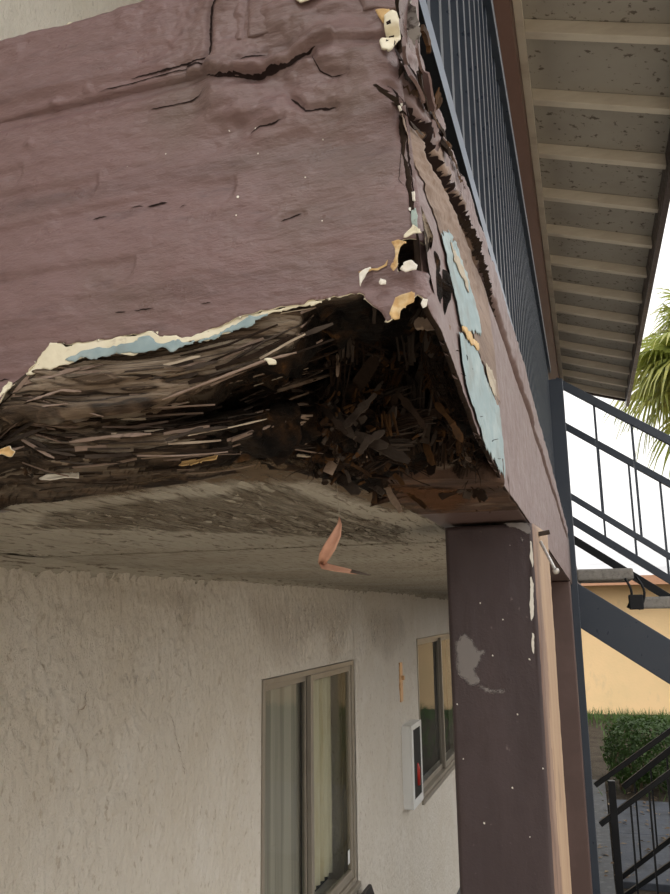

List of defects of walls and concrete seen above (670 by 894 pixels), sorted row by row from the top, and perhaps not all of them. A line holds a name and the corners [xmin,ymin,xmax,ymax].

peeling [375,0,421,52]
crack [105,0,345,109]
crack [291,99,335,112]
peeling [359,105,505,479]
peeling [26,300,323,376]
peeling [0,446,15,457]
peeling [39,472,79,480]
peeling [179,455,218,466]
peeling [455,634,503,692]